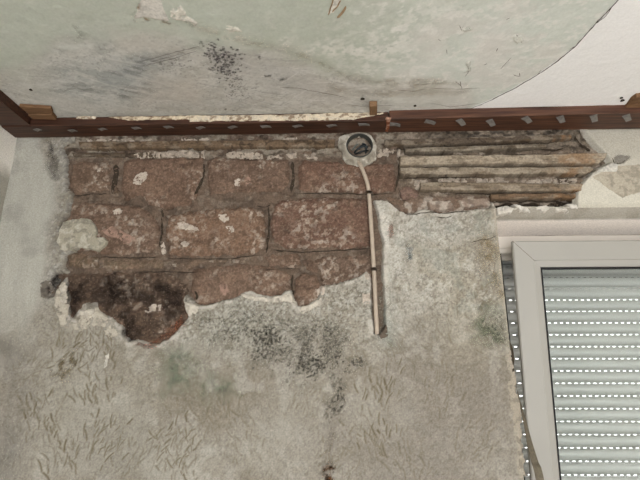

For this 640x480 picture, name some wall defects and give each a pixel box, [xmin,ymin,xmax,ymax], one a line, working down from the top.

spalling [40,129,640,344]